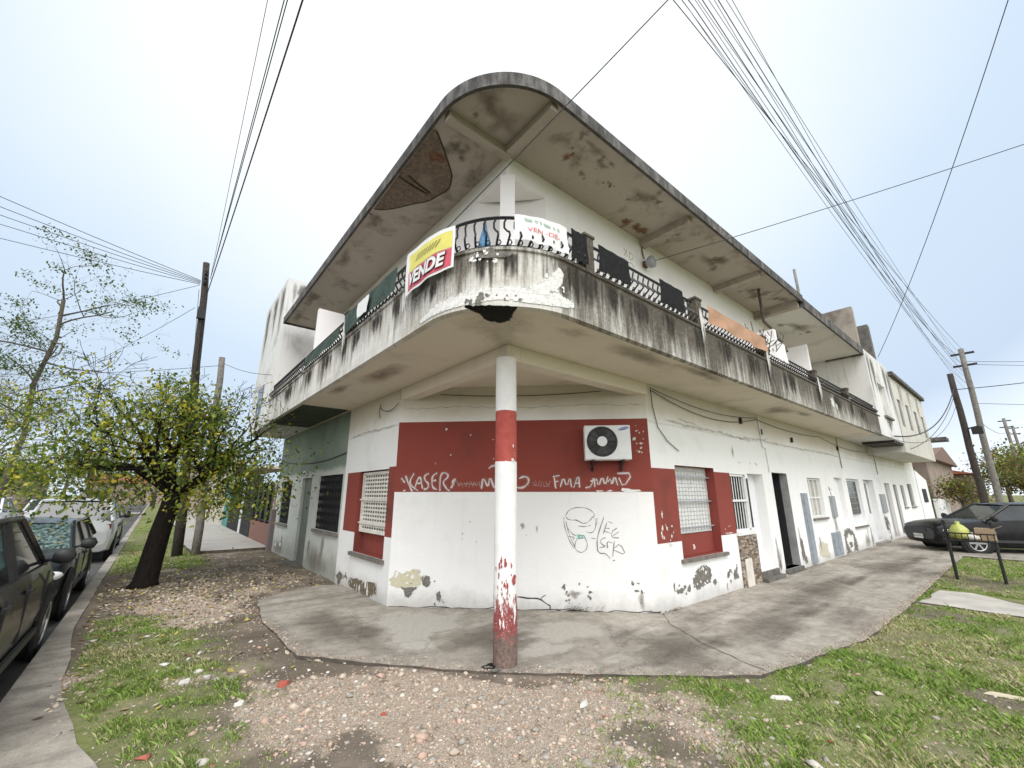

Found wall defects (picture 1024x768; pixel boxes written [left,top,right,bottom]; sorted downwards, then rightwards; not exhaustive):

water stain [372,282,437,332]
spalling [467,247,513,262]
water stain [463,254,518,281]
spalling [464,292,522,323]
peeling [529,267,572,305]
water stain [569,267,649,321]
water stain [695,310,706,347]
water stain [284,322,359,401]
water stain [816,378,867,420]
peeling [336,569,444,606]
peeling [495,557,516,628]
peeling [673,564,739,595]